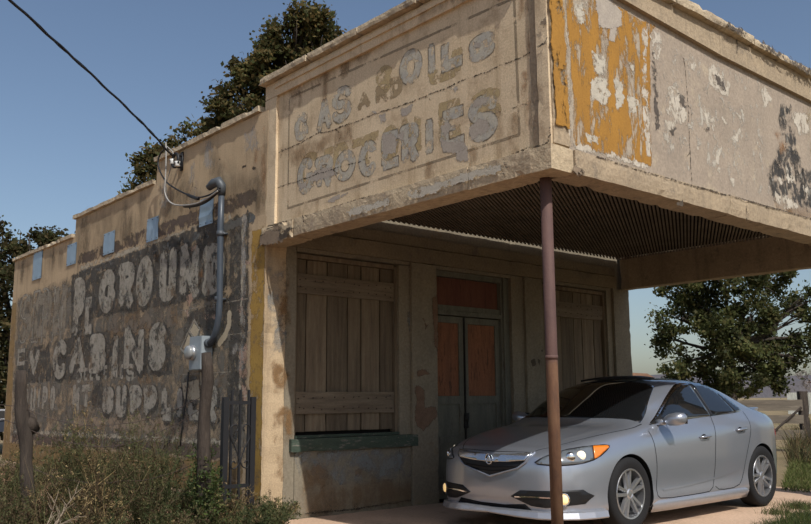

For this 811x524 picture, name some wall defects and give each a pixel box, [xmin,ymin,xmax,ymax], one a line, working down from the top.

crack [280,38,547,158]
peeling [540,0,811,209]
peeling [408,162,501,198]
peeling [346,198,390,217]
spalling [259,223,290,247]